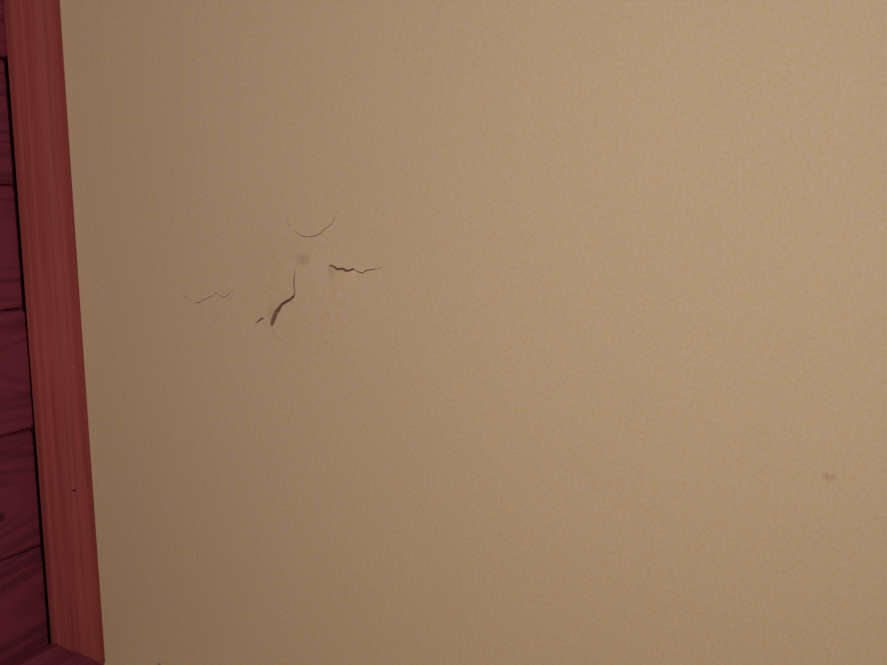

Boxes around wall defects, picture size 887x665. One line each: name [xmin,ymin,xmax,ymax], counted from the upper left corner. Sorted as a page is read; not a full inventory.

crack [256,270,296,325]
crack [328,265,382,293]